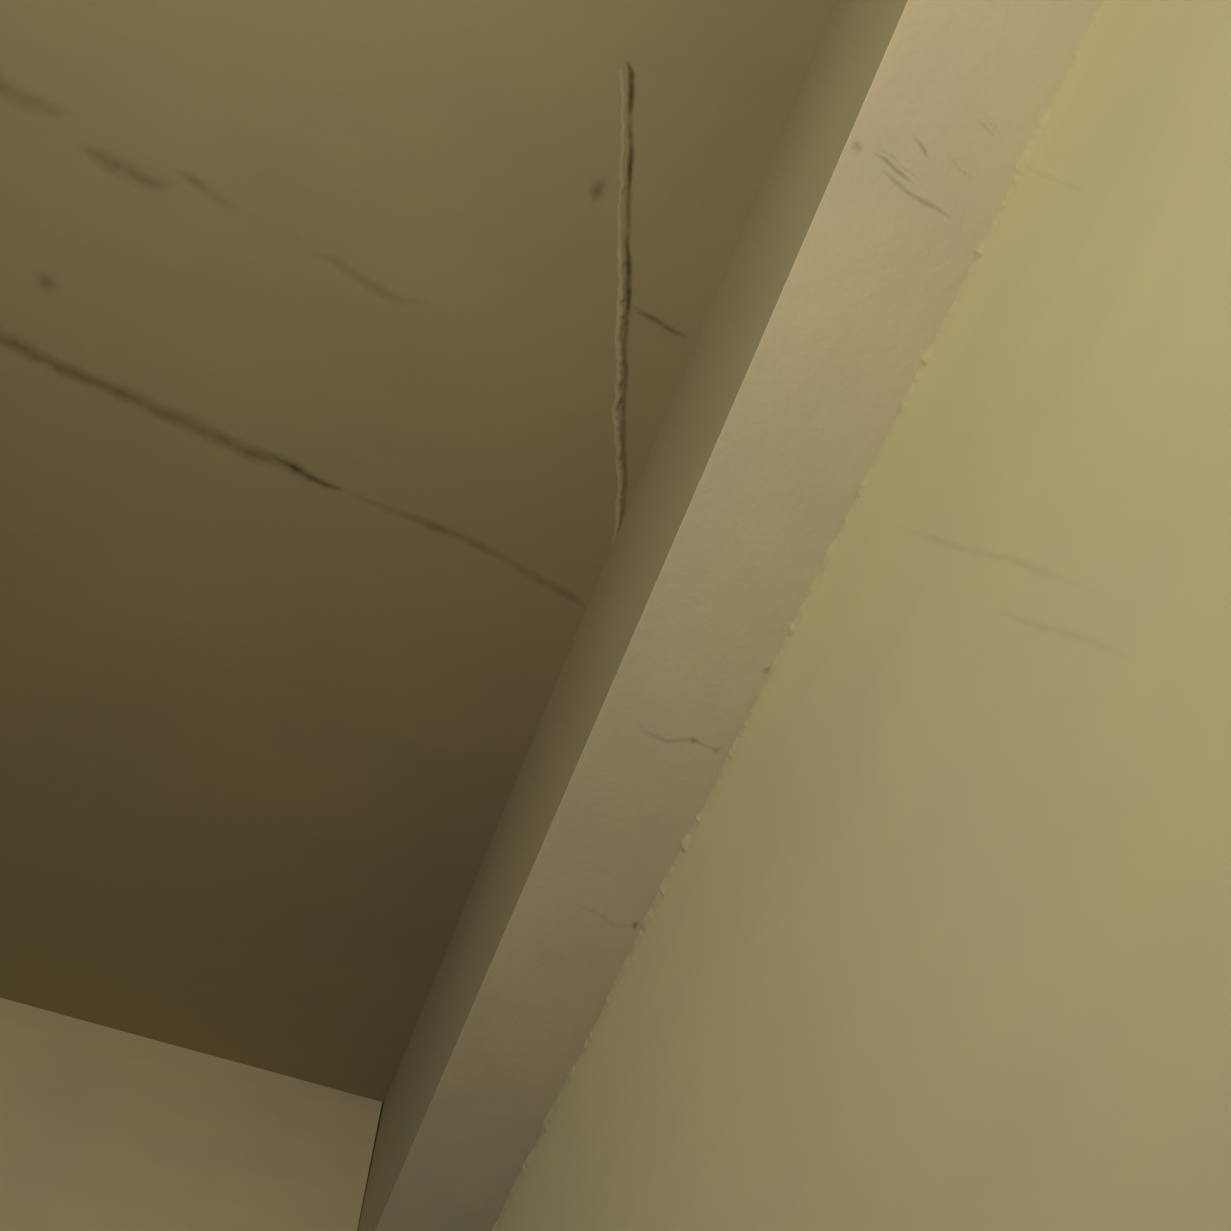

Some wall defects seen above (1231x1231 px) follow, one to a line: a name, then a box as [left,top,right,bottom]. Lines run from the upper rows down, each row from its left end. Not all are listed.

crack [612,70,626,544]